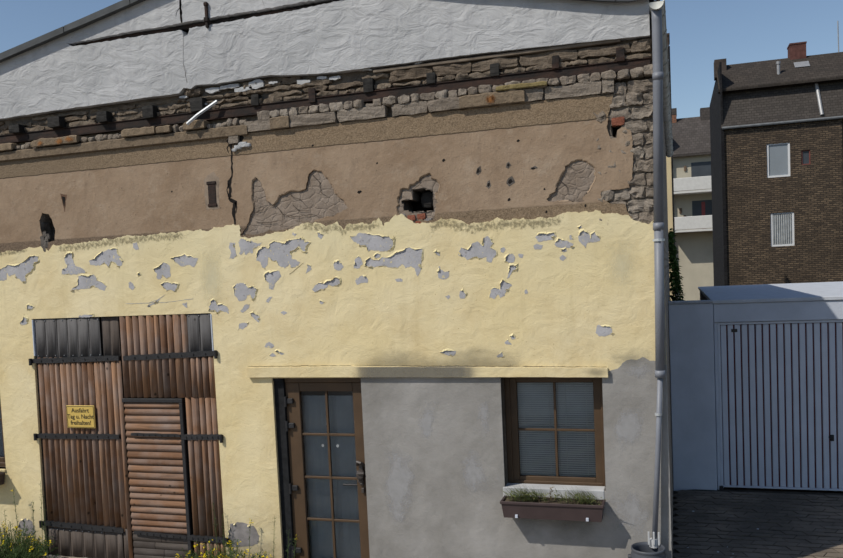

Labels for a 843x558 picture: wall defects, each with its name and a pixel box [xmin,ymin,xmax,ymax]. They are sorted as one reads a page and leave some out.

spalling [611,117,625,137]
crack [226,140,237,225]
flaking render [396,172,440,224]
flaking render [543,159,596,213]
peeling [0,214,55,283]
peeling [61,247,123,291]
peeling [152,253,198,292]
flaking render [229,170,348,330]
peeling [349,233,440,285]
peeling [458,236,523,299]
peeling [534,225,601,261]
peeling [227,522,259,548]